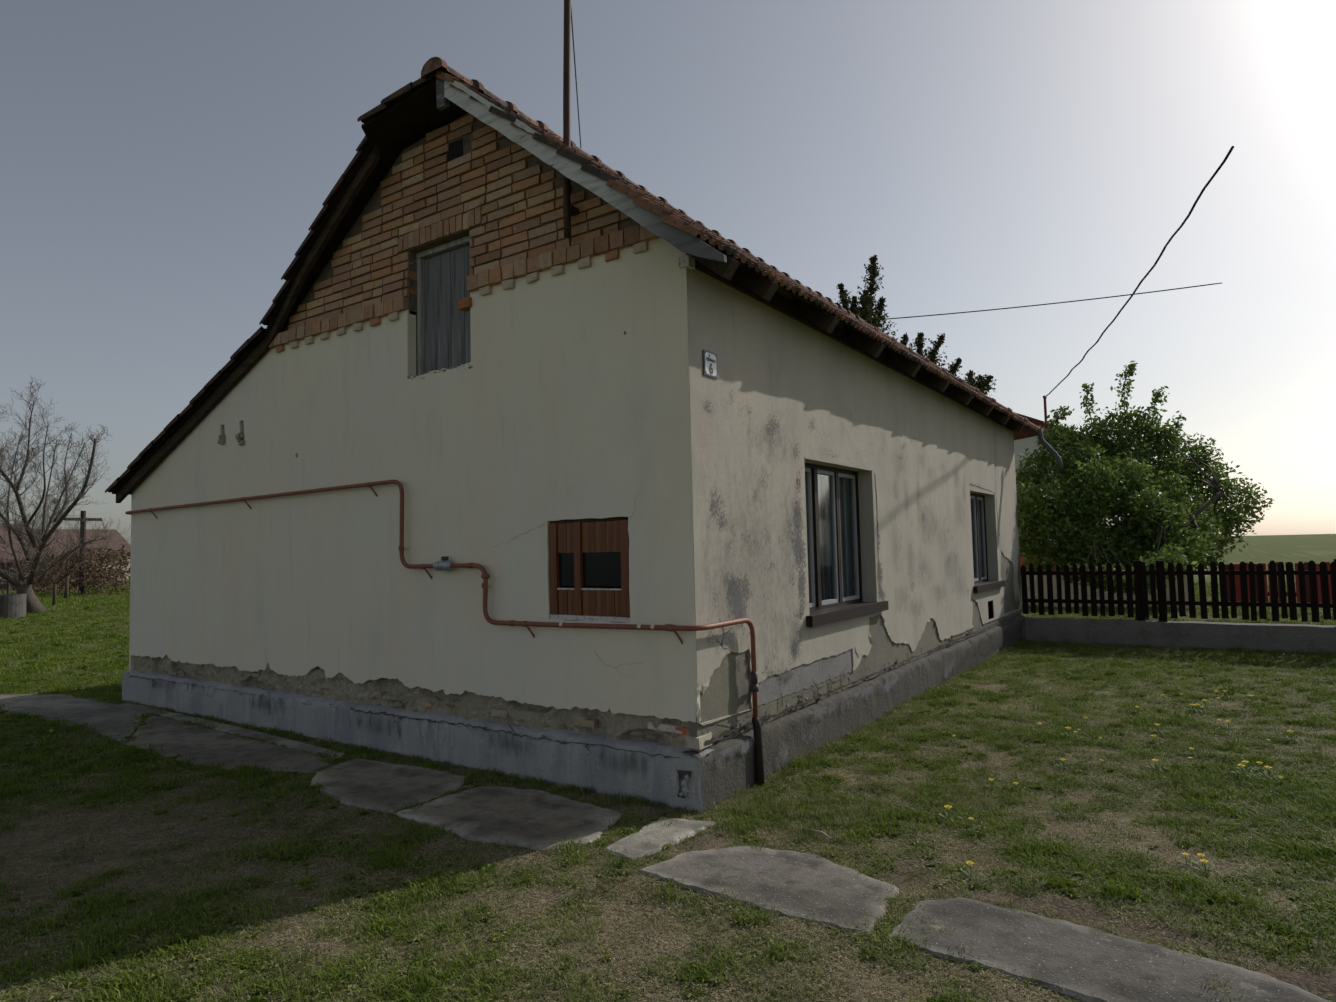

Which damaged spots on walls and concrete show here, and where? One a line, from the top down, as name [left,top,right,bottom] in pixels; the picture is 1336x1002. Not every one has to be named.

spalling [130,550,1022,759]
leakage [709,444,806,683]